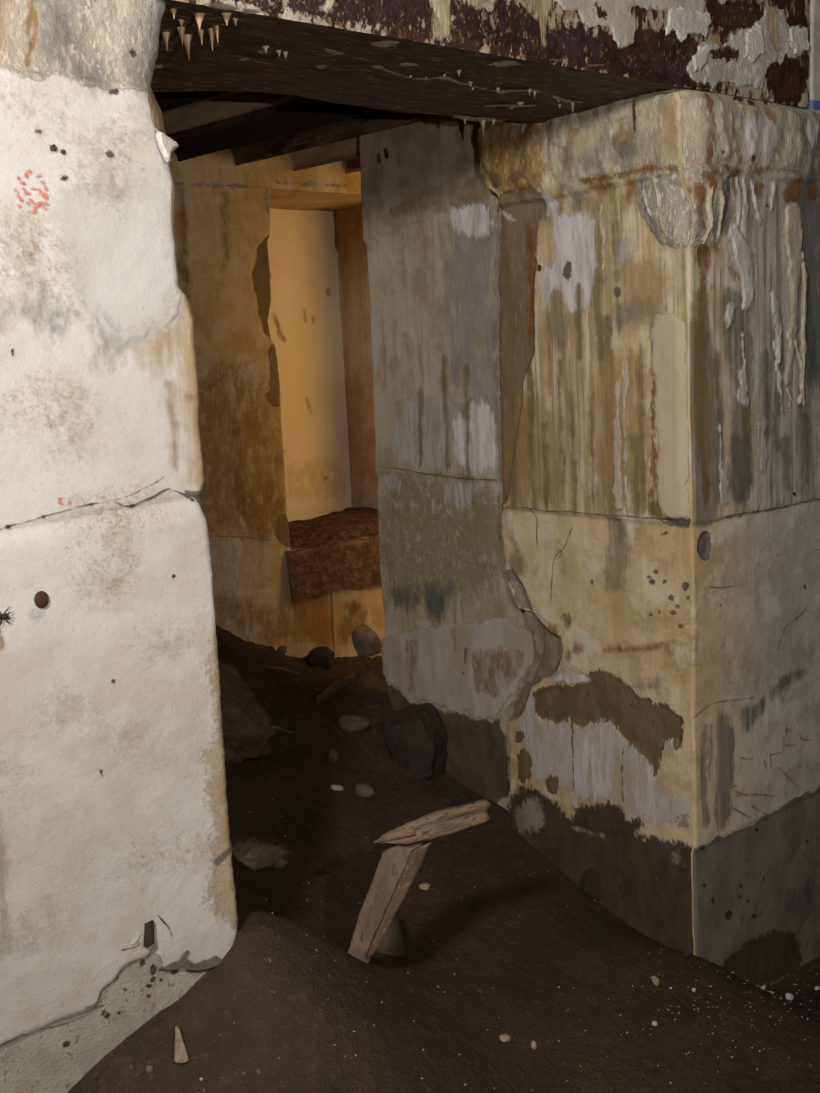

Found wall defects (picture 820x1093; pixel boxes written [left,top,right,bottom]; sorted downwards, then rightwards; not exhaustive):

corrosion [232,0,435,28]
corrosion [452,0,693,81]
peeling [525,0,810,90]
corrosion [707,0,806,32]
corrosion [766,56,809,102]
leakage [372,62,820,527]
leakage [178,334,283,537]
crack [6,481,275,541]
peeling [382,569,690,786]
peeling [545,775,559,795]
leakage [437,709,820,988]
spalling [0,951,223,1093]